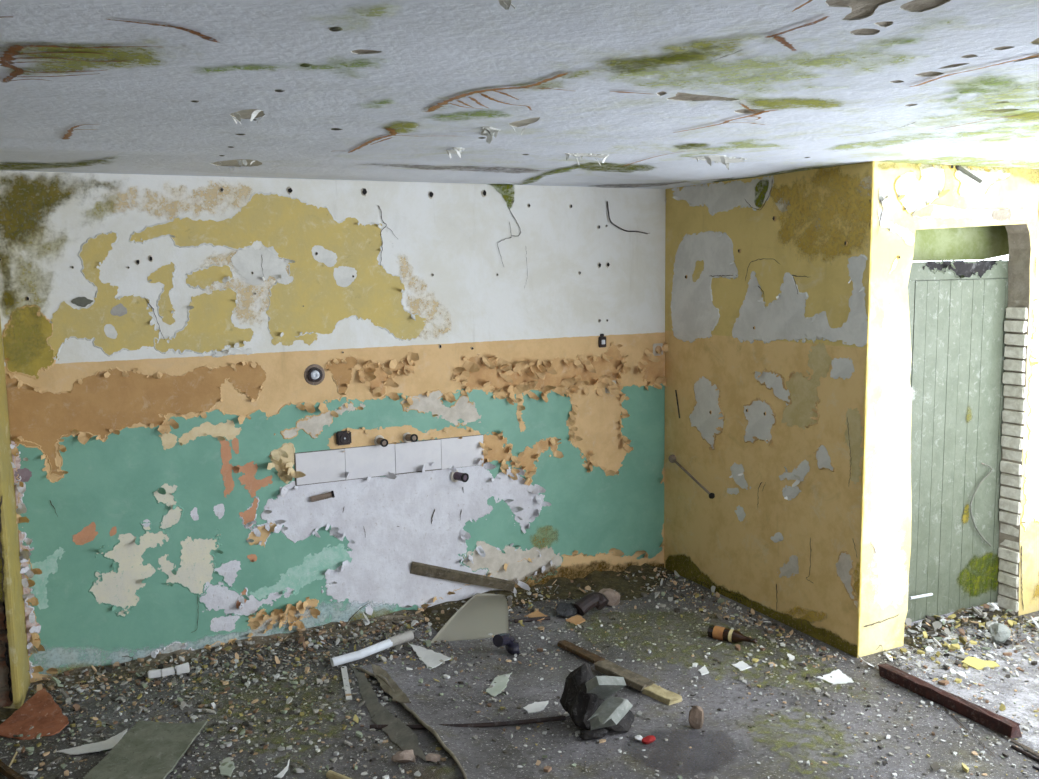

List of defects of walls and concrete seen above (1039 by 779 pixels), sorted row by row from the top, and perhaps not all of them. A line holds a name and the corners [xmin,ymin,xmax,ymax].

corrosion [106,19,217,42]
spalling [825,0,950,35]
corrosion [0,45,152,83]
spalling [890,54,977,83]
corrosion [426,73,571,112]
corrosion [673,104,776,133]
corrosion [348,128,403,153]
peeling [2,191,912,679]
crack [0,496,8,601]
flaking render [0,597,13,708]
flaking render [816,669,854,685]
spalling [523,663,634,732]